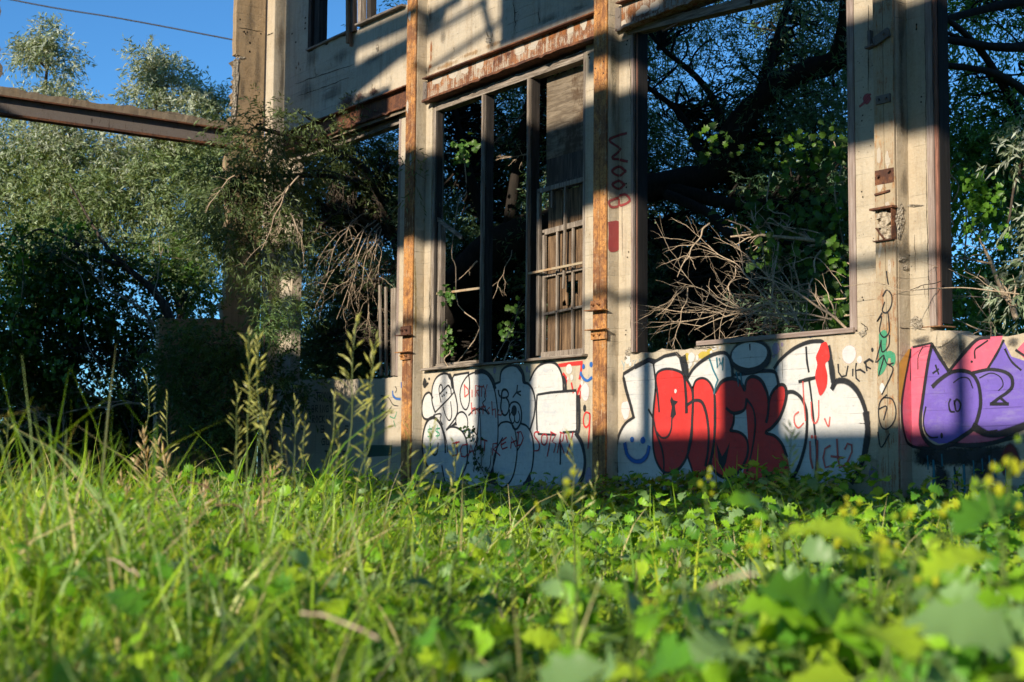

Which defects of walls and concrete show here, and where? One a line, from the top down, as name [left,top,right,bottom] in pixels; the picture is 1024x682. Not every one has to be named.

peeling [877,147,890,168]
spalling [877,184,924,239]